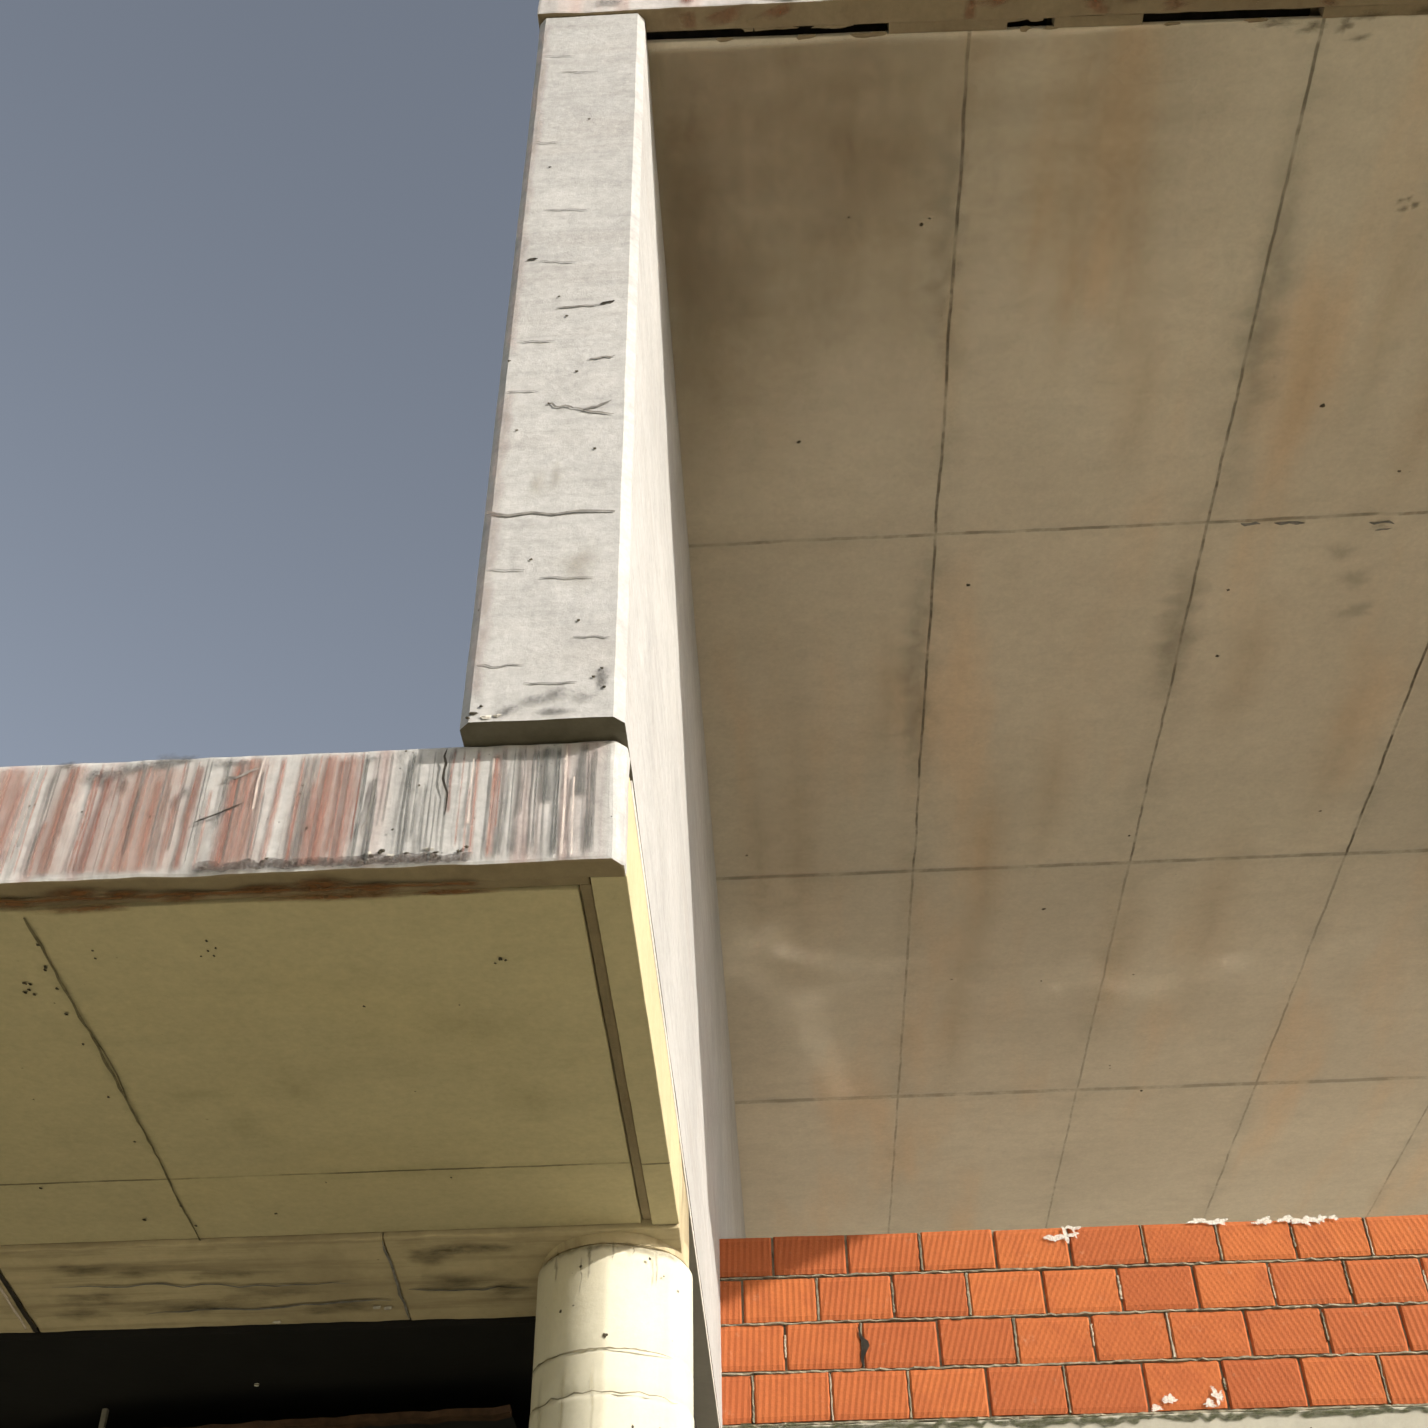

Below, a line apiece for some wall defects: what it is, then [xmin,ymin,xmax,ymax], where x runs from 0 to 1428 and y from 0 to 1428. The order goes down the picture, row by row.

crack [524,300,615,342]
crack [507,390,614,414]
crack [487,509,615,517]
crack [488,568,589,579]
crack [476,664,577,684]
crack [441,750,449,815]
rust [0,756,364,874]
rust [0,880,485,913]
crack [23,918,201,1241]
crack [0,1273,38,1332]
crack [67,1241,525,1320]
crack [529,1347,678,1417]